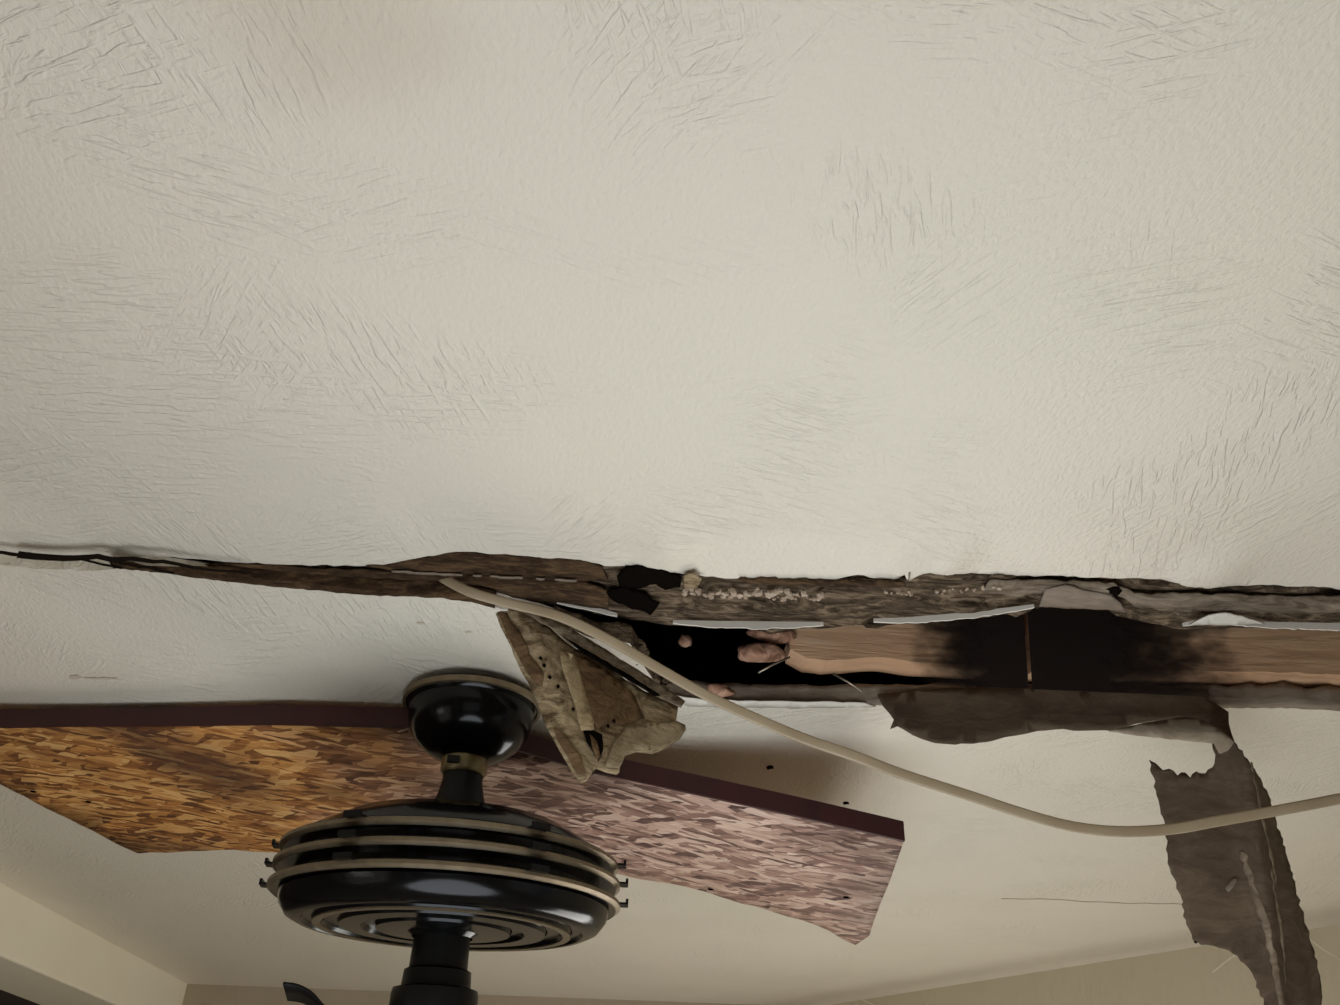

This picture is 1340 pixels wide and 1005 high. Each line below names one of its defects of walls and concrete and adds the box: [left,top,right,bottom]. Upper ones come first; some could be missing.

crack [0,550,247,575]
leakage [934,607,1197,696]